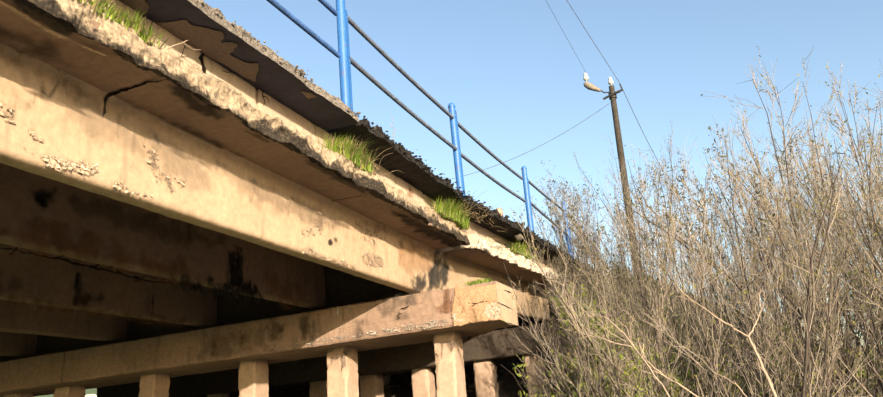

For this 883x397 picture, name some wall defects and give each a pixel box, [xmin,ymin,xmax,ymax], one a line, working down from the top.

peeling [119,0,149,15]
peeling [155,20,259,82]
crack [103,79,166,115]
spalling [23,147,99,178]
spalling [111,180,153,199]
spalling [144,144,185,192]
crack [0,248,180,318]
water stain [172,247,265,303]
water stain [413,259,449,292]
spalling [271,284,502,352]